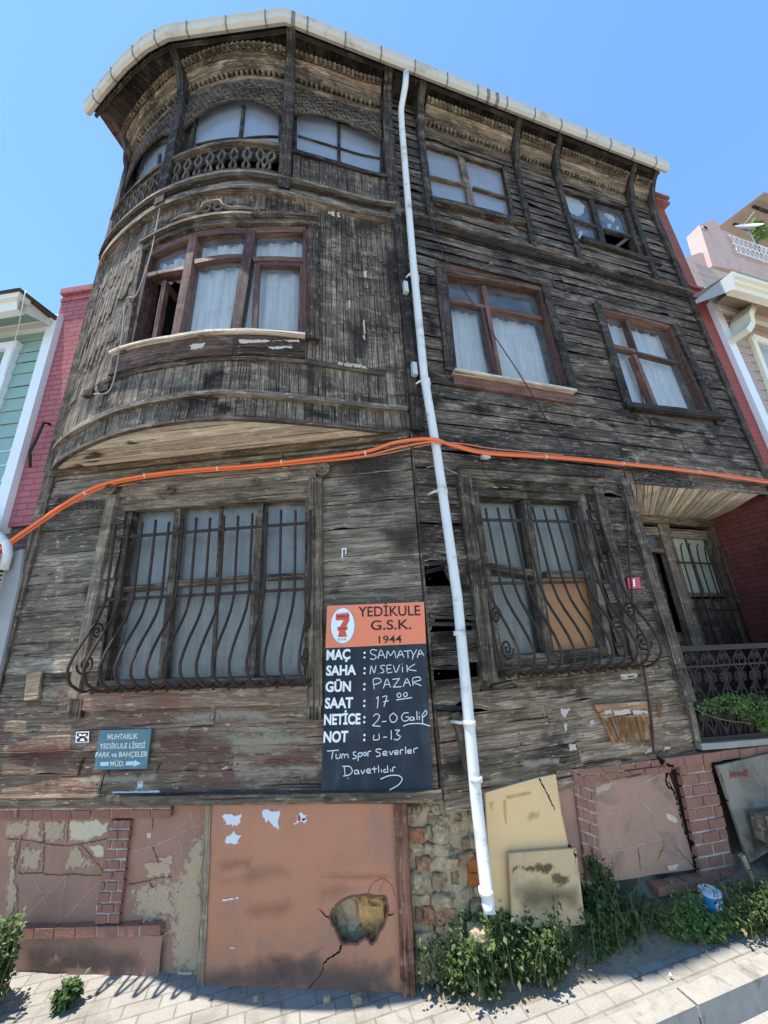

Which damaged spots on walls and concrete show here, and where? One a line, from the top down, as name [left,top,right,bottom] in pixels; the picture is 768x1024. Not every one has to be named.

peeling [238,339,299,349]
crack [539,772,577,860]
crack [657,755,701,870]
peeling [4,819,108,918]
flaking render [130,834,204,975]
spalling [329,893,389,946]
crack [308,945,342,989]